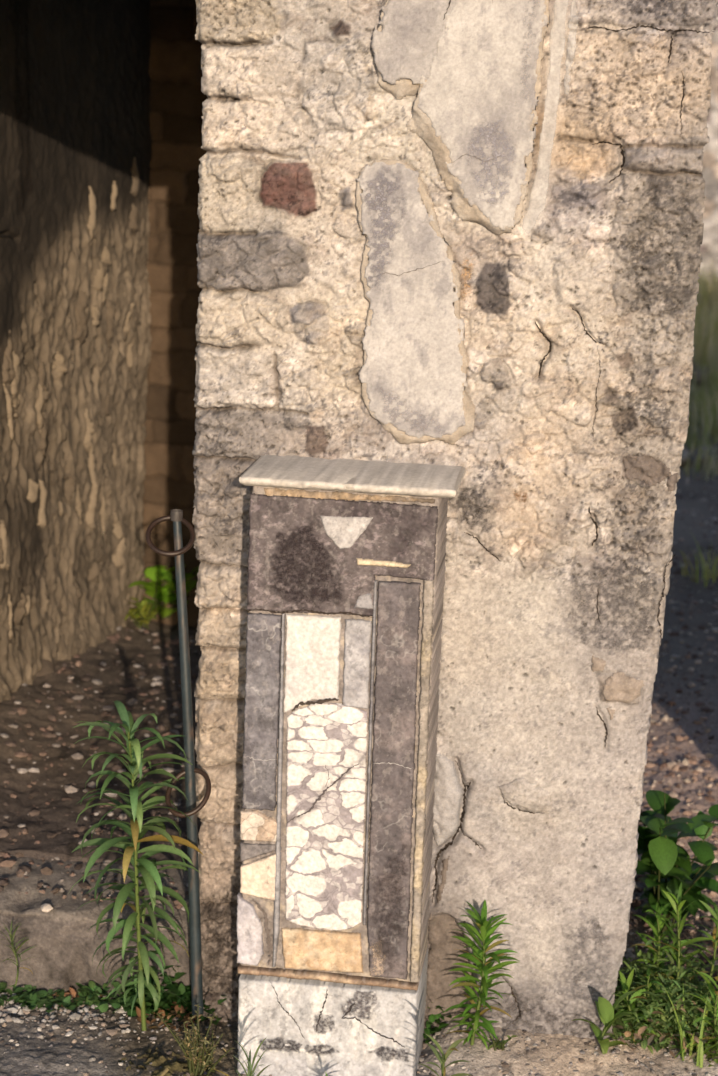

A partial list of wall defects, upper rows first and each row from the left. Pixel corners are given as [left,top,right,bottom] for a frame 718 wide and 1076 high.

crack [587,25,715,133]
crack [592,141,625,183]
crack [535,322,552,376]
crack [572,308,604,437]
crack [432,761,482,903]
crack [253,899,404,1047]